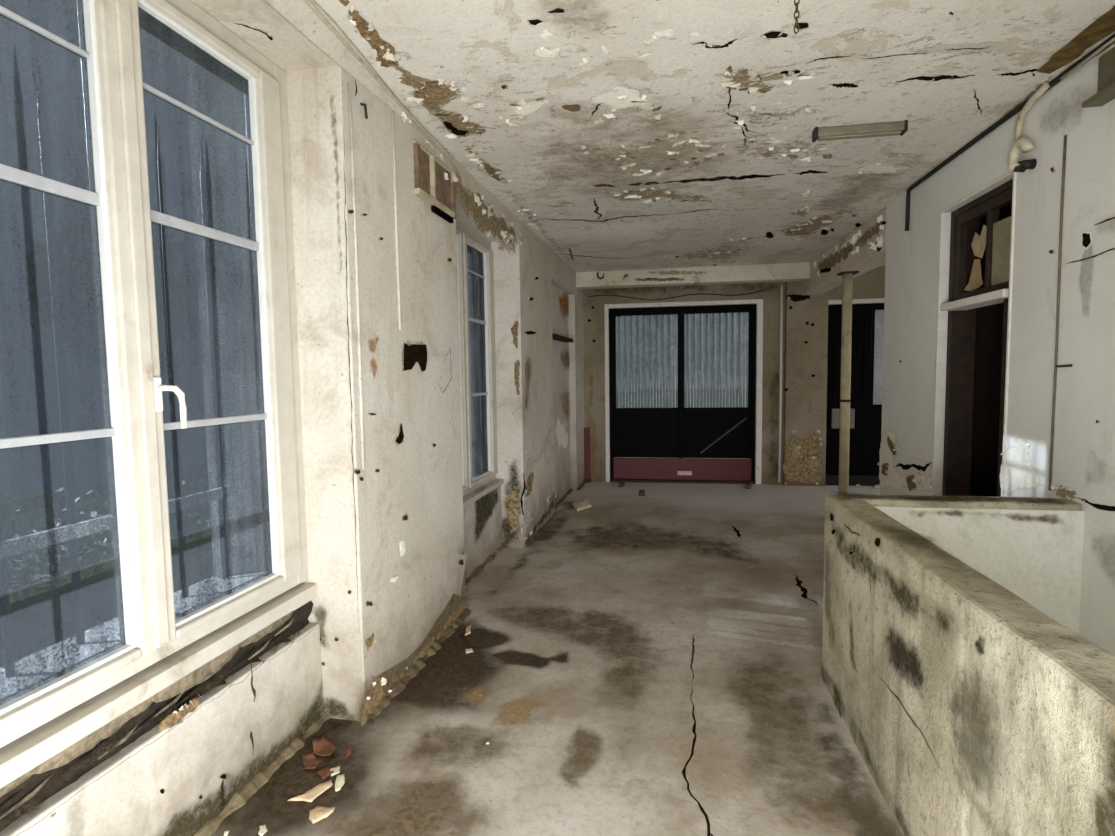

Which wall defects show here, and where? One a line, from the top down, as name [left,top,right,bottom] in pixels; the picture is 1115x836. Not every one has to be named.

peeling [761,23,809,40]
spalling [339,0,570,259]
crack [530,89,827,222]
peeling [562,66,833,204]
damp [475,465,742,568]
damp [833,491,1063,523]
crack [1068,491,1115,511]
crack [795,575,819,606]
peeling [157,694,202,732]
damp [164,576,567,836]
crack [671,621,713,836]
damp [887,630,923,688]